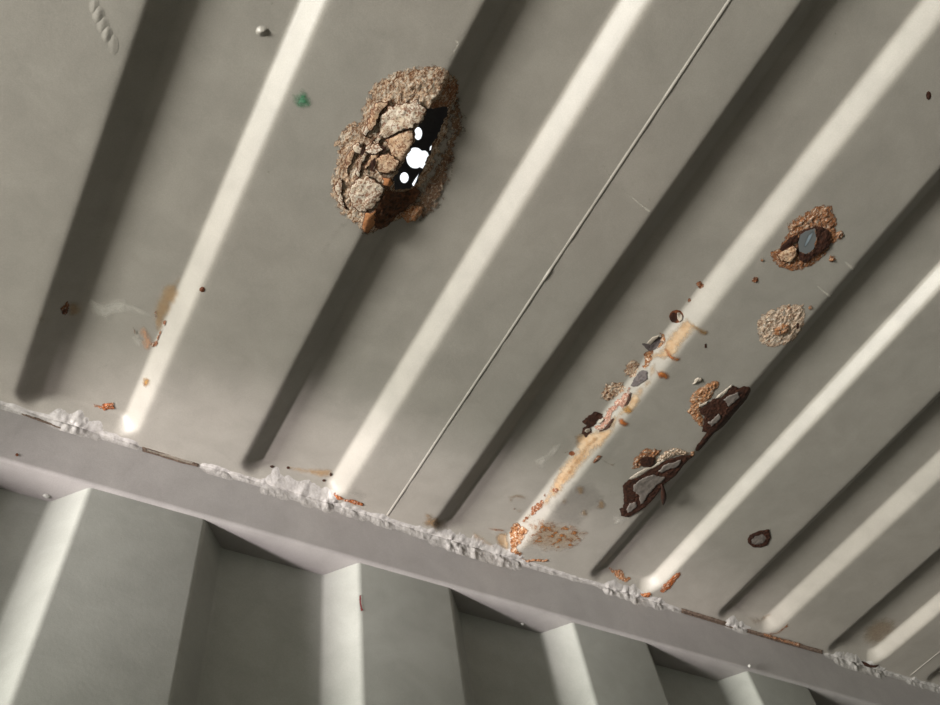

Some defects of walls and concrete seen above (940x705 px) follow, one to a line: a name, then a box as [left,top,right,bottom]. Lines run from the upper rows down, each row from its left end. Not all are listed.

peeling [334,99,427,233]
peeling [776,245,797,263]
corrosion [651,321,706,379]
peeling [581,333,665,438]
corrosion [496,360,642,562]
peeling [629,448,689,480]
corrosion [619,381,751,517]
peeling [747,529,771,548]
corrosion [640,572,680,597]
corrosion [681,608,822,654]